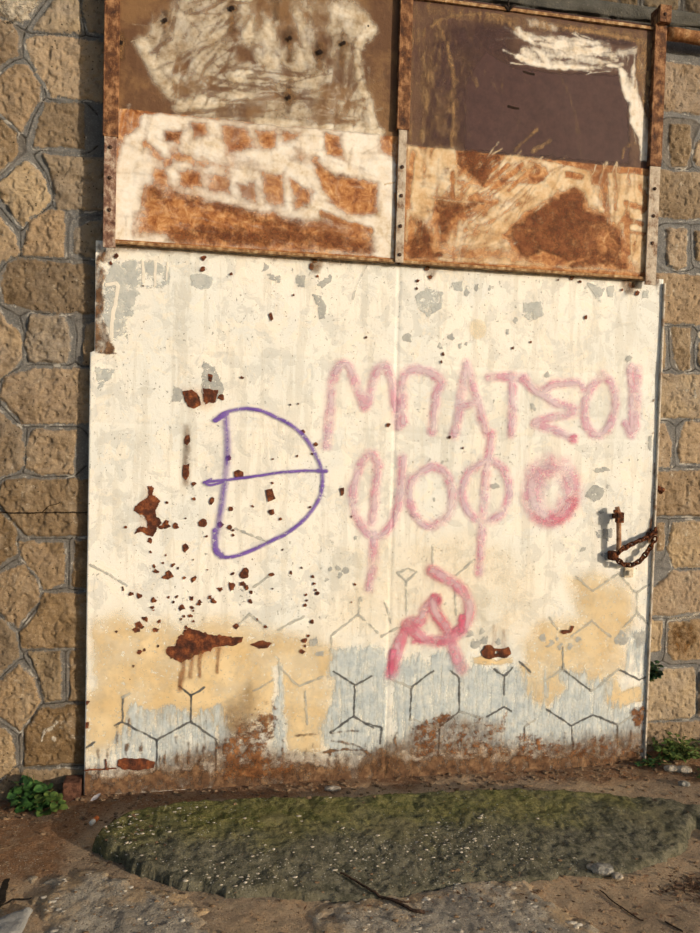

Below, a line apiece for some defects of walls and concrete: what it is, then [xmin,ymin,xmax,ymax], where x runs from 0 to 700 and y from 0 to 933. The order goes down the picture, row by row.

peeling [115,0,400,265]
peeling [511,21,648,161]
peeling [103,253,170,342]
peeling [190,256,213,289]
peeling [293,259,332,319]
peeling [405,146,649,272]
corrosion [511,190,639,293]
corrosion [182,374,224,409]
corrosion [134,486,179,544]
corrosion [607,506,624,561]
corrosion [166,628,272,690]
corrosion [84,702,645,795]